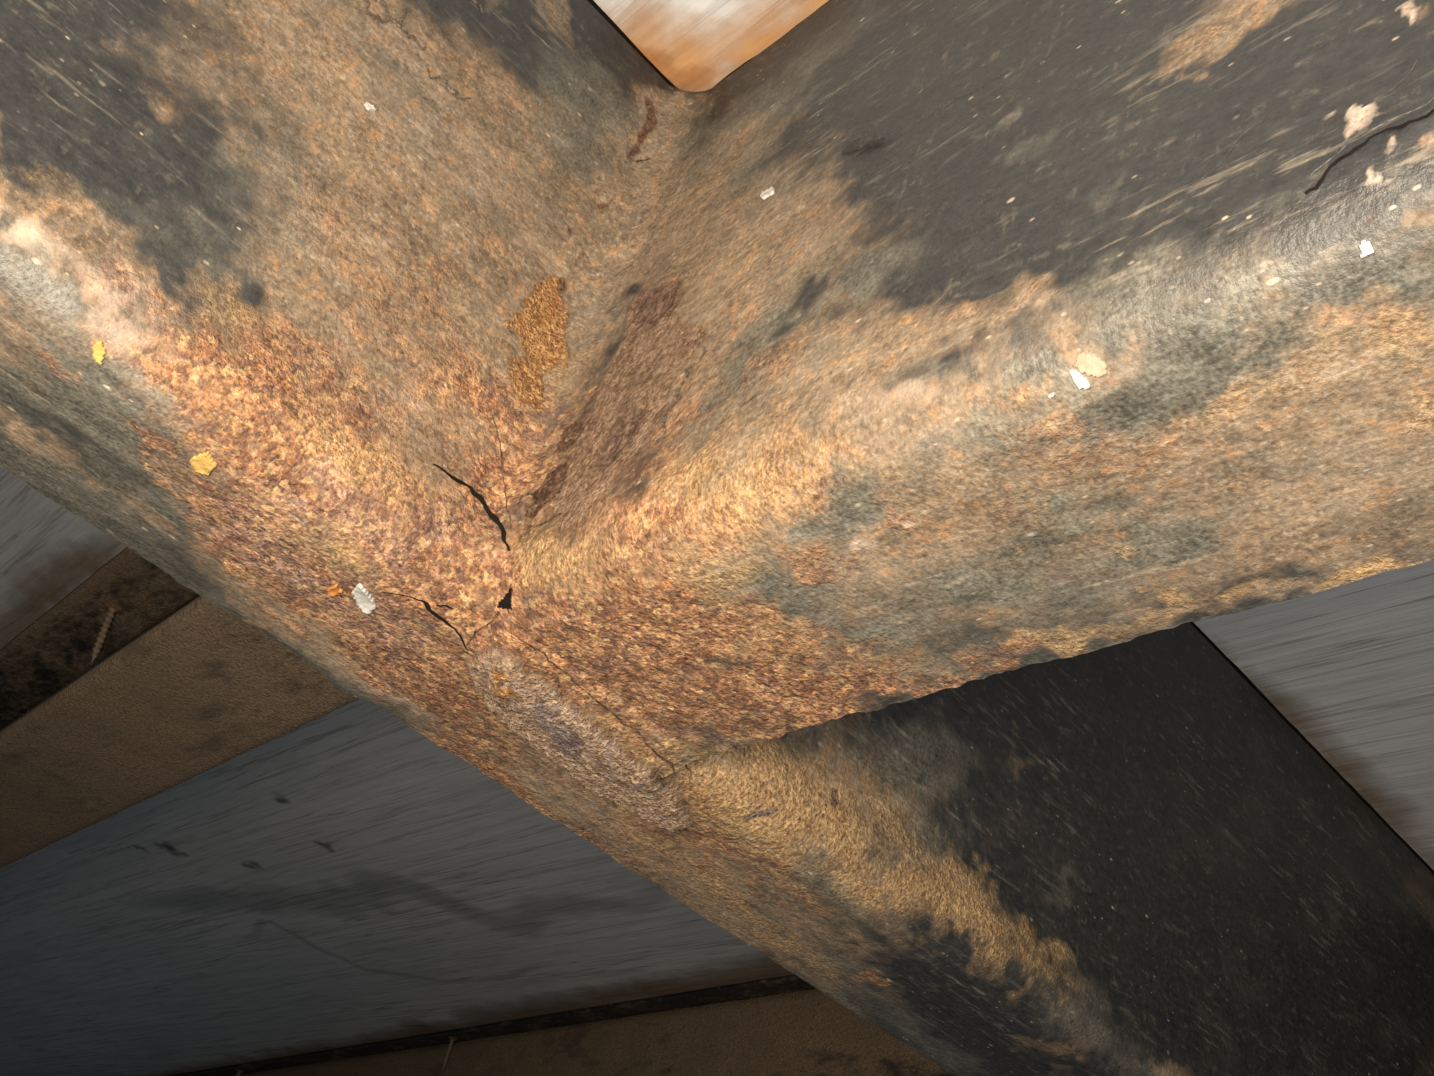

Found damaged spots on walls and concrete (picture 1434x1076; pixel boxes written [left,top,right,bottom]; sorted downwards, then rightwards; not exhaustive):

rust [623,0,829,92]
crack [433,390,511,551]
rust [503,275,569,412]
rust [553,281,705,531]
crack [383,592,500,650]
rust [744,809,777,820]